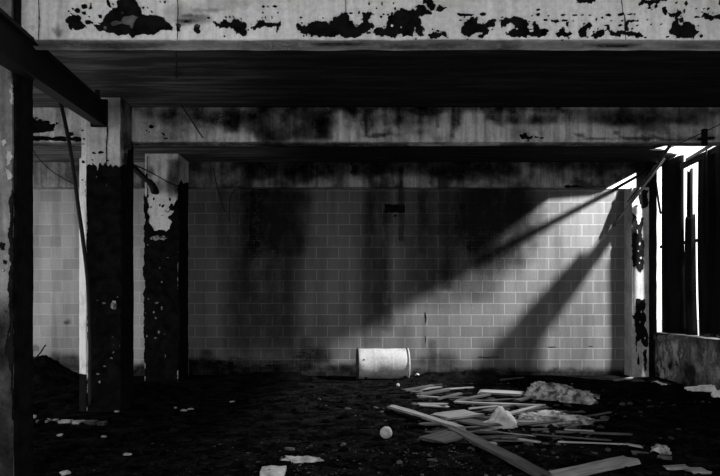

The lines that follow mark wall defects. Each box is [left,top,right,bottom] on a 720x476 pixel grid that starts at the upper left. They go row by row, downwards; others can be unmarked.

peeling [65,0,201,38]
peeling [207,5,281,37]
peeling [296,0,449,40]
peeling [457,0,720,41]
peeling [33,117,85,142]
peeling [631,189,649,272]
peeling [632,298,649,371]